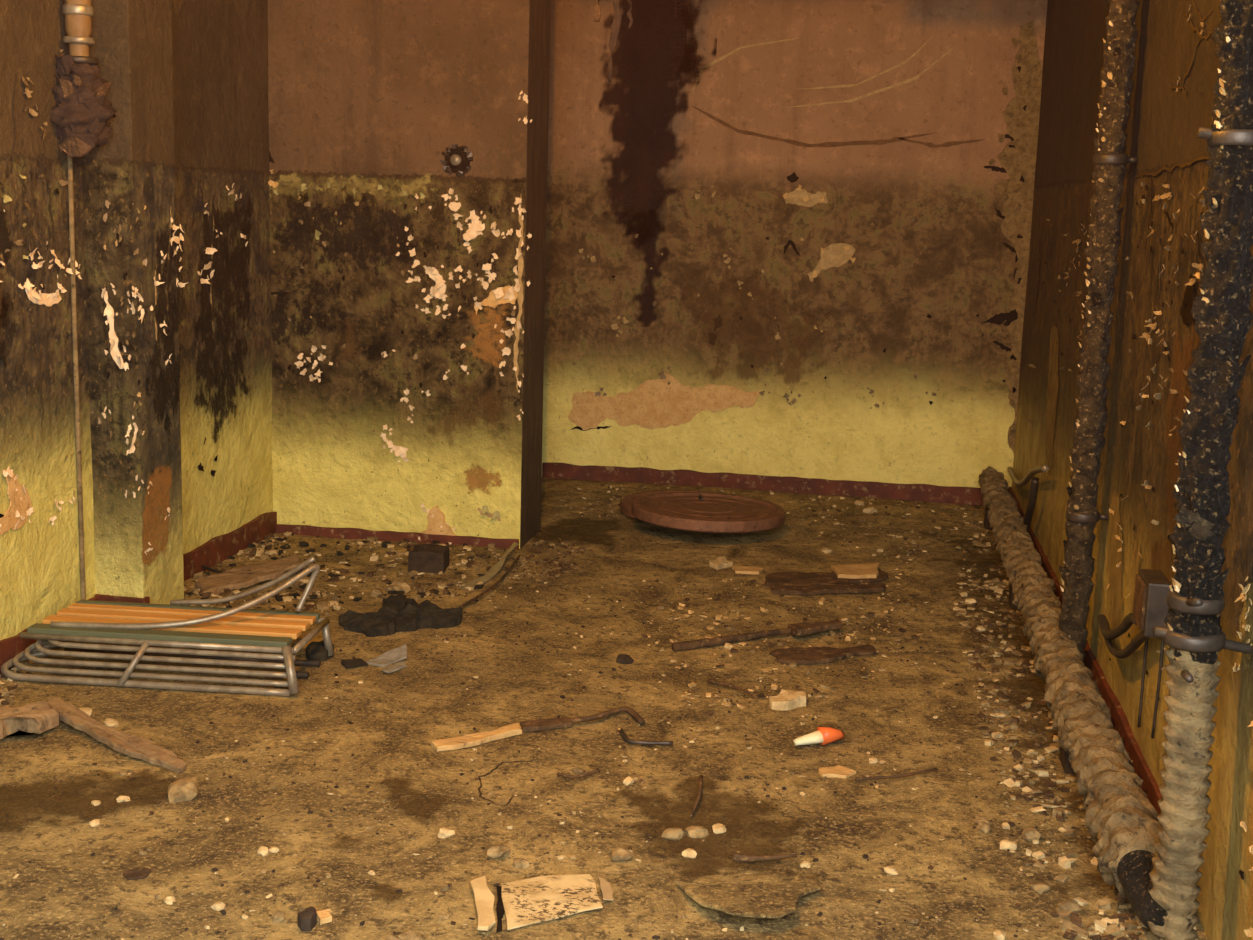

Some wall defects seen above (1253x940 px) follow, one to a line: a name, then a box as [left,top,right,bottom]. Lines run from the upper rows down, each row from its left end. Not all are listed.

water stain [675,10,717,85]
water stain [0,177,12,262]
peeling [0,203,82,329]
water stain [269,171,438,348]
peeling [393,144,532,392]
peeling [98,185,222,456]
water stain [193,195,255,477]
peeling [287,345,333,382]
peeling [380,425,409,462]
peeling [400,383,431,423]
peeling [568,366,802,431]
peeling [0,466,34,535]